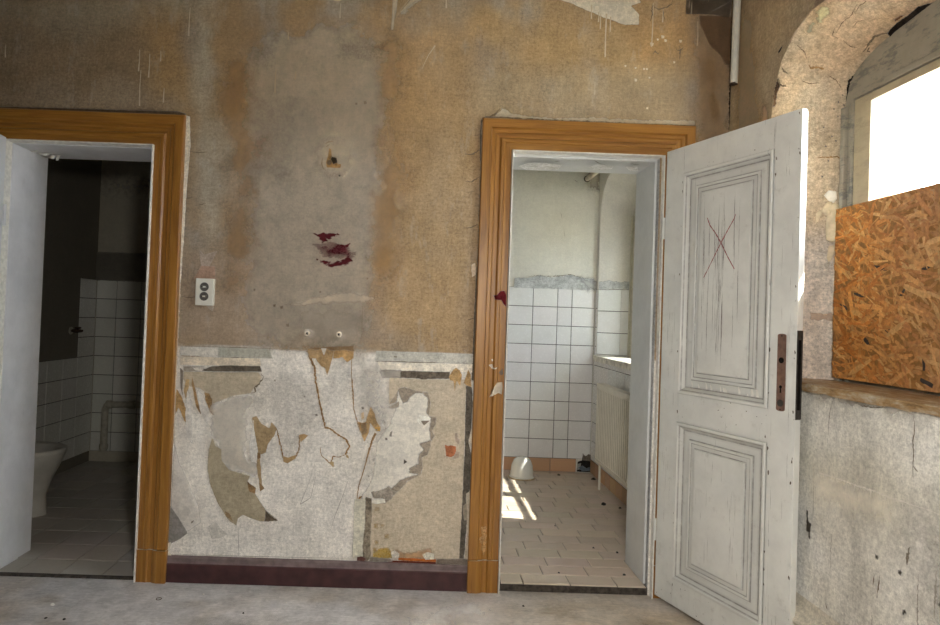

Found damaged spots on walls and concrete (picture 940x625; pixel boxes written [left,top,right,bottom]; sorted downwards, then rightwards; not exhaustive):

peeling [375,351,473,380]
peeling [445,429,472,459]